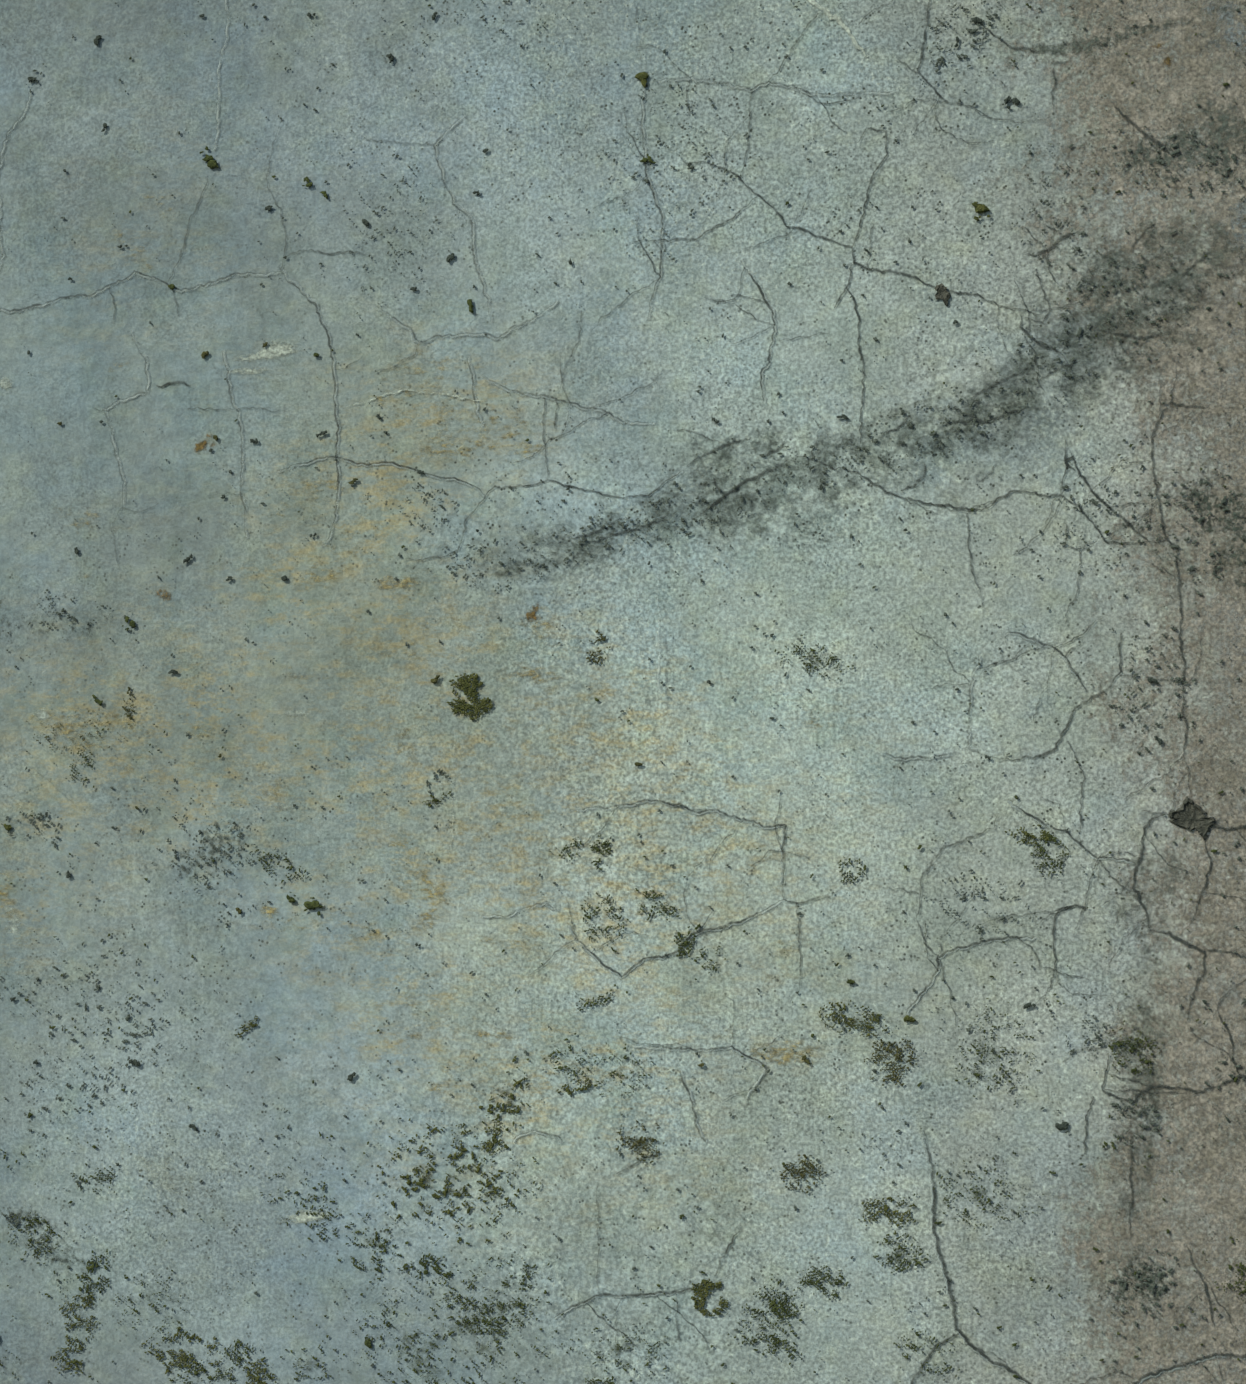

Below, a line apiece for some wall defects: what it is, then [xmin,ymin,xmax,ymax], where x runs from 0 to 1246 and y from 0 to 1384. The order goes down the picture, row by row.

crack [580,6,1095,434]
crack [11,186,679,561]
leakage [536,492,679,567]
leakage [694,431,867,532]
leakage [882,226,1235,489]
crack [533,799,815,976]
crack [795,374,1246,1151]
peeling [1031,0,1246,1384]
crack [634,1037,777,1133]
crack [554,1234,736,1343]
crack [911,1132,1031,1384]
crack [1070,1252,1246,1384]